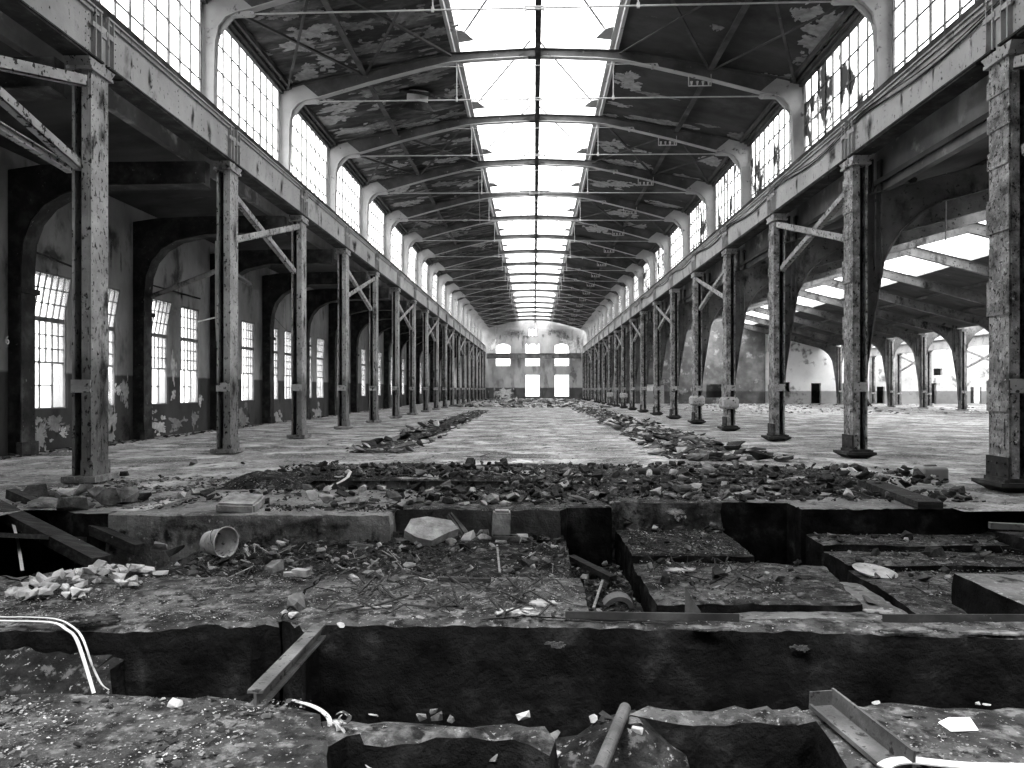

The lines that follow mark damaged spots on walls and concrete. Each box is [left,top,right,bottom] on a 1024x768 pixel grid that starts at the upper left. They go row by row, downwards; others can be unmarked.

peeling [254,0,460,84]
peeling [761,0,852,79]
peeling [312,67,470,136]
peeling [614,70,678,100]
peeling [603,101,750,140]
peeling [596,139,653,170]
peeling [588,179,640,190]
peeling [35,415,70,451]
peeling [152,395,202,436]